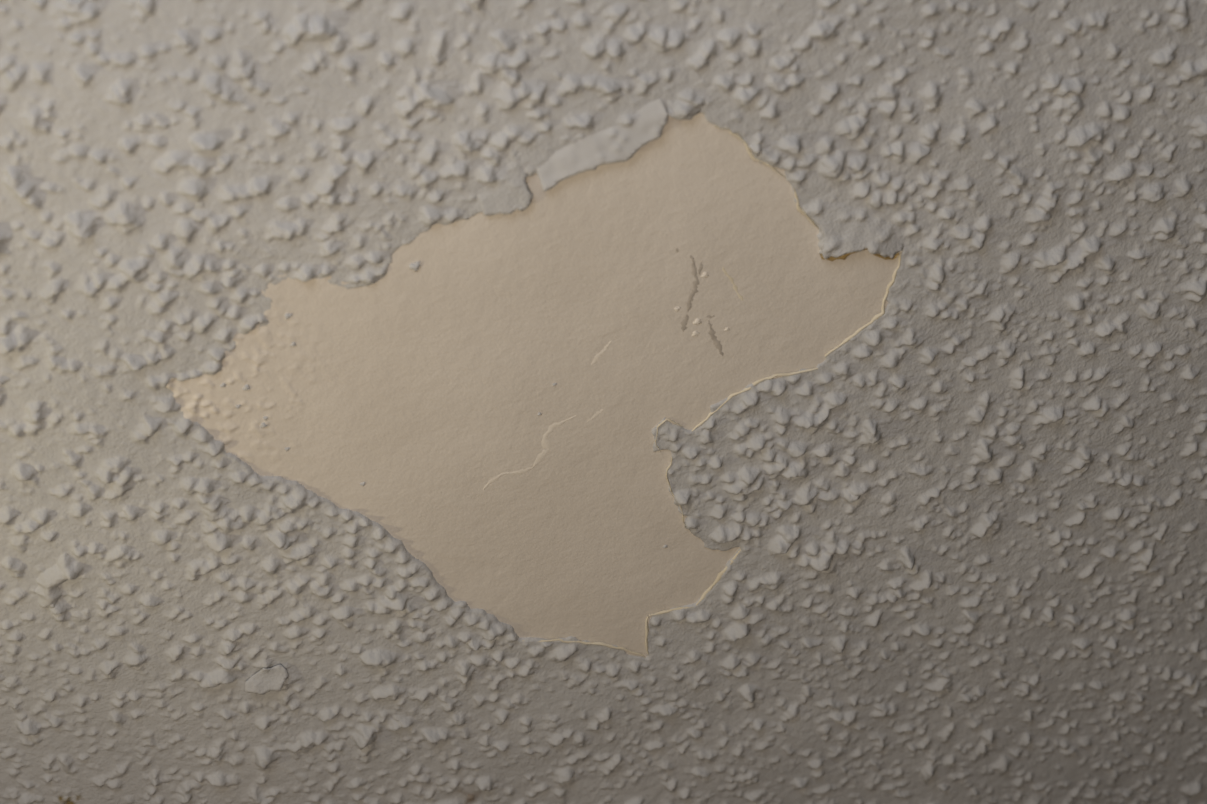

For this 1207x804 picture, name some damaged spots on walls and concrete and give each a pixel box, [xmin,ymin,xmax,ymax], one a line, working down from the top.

peeling [166,98,904,658]
peeling [245,664,288,695]